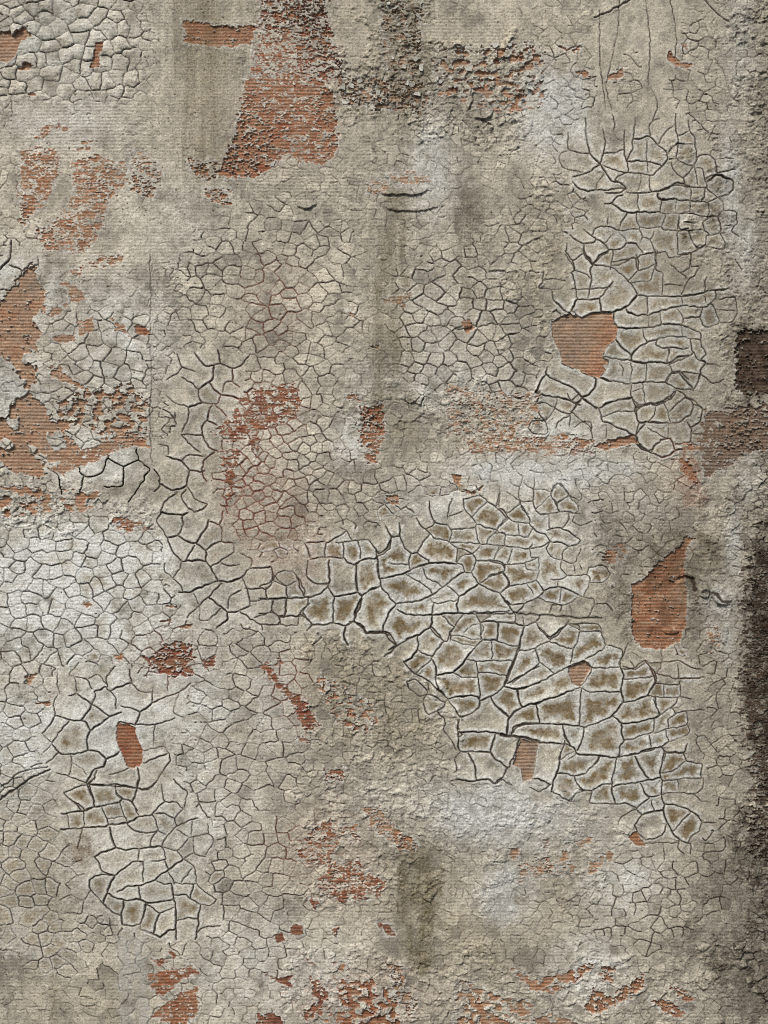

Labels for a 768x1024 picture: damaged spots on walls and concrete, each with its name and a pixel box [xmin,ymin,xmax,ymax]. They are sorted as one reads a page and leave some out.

peeling [0,27,32,70]
peeling [182,0,547,206]
crack [386,10,747,460]
peeling [0,122,163,518]
peeling [551,311,618,379]
peeling [211,383,301,502]
peeling [679,328,768,484]
peeling [142,605,216,678]
crack [0,205,756,1000]
peeling [631,536,696,650]
peeling [116,722,143,768]
peeling [148,951,200,1024]